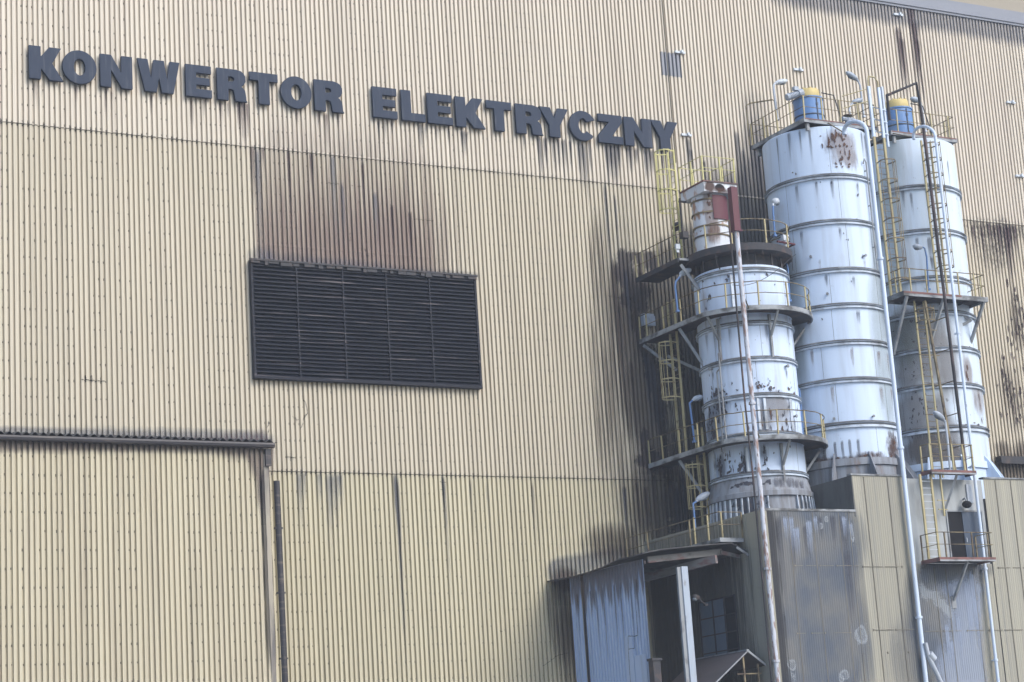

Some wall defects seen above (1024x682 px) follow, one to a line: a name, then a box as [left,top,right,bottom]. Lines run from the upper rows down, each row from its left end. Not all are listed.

corrosion [819,129,852,168]
corrosion [757,384,795,431]
leakage [783,518,817,537]